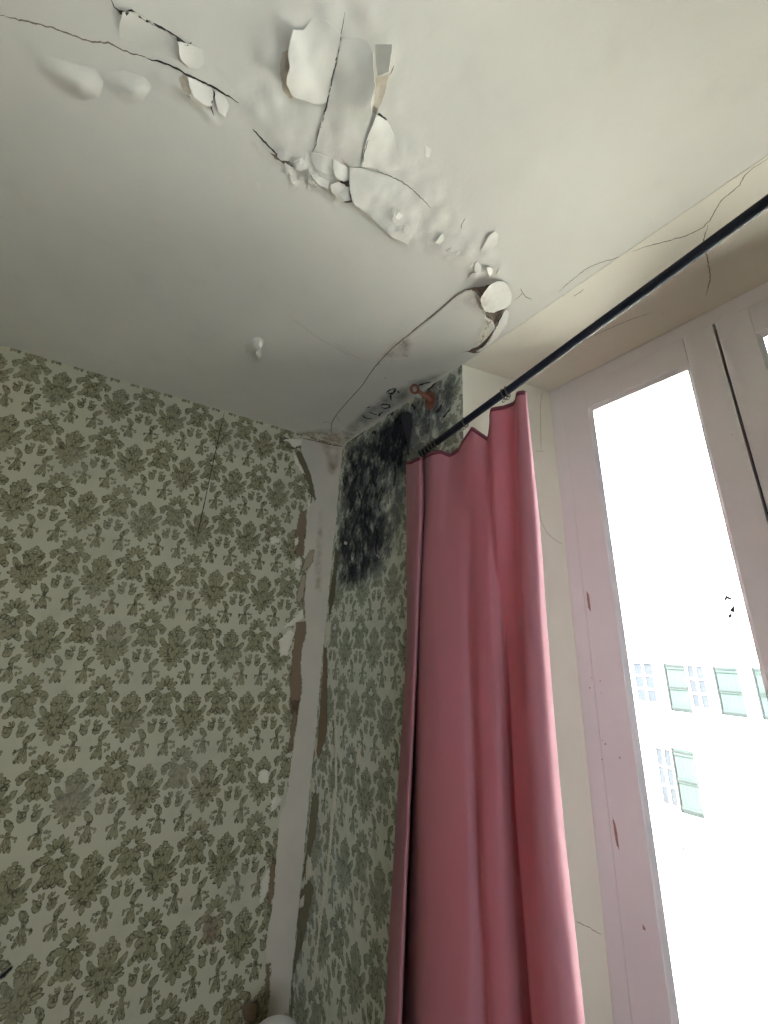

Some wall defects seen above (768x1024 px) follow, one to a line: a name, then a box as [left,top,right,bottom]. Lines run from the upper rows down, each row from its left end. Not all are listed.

crack [0,0,239,116]
peeling [116,9,229,117]
crack [253,129,293,167]
peeling [271,18,462,260]
crack [560,159,767,296]
crack [300,287,477,447]
peeling [377,232,512,374]
damp [330,377,450,583]
flaking render [258,437,343,1018]